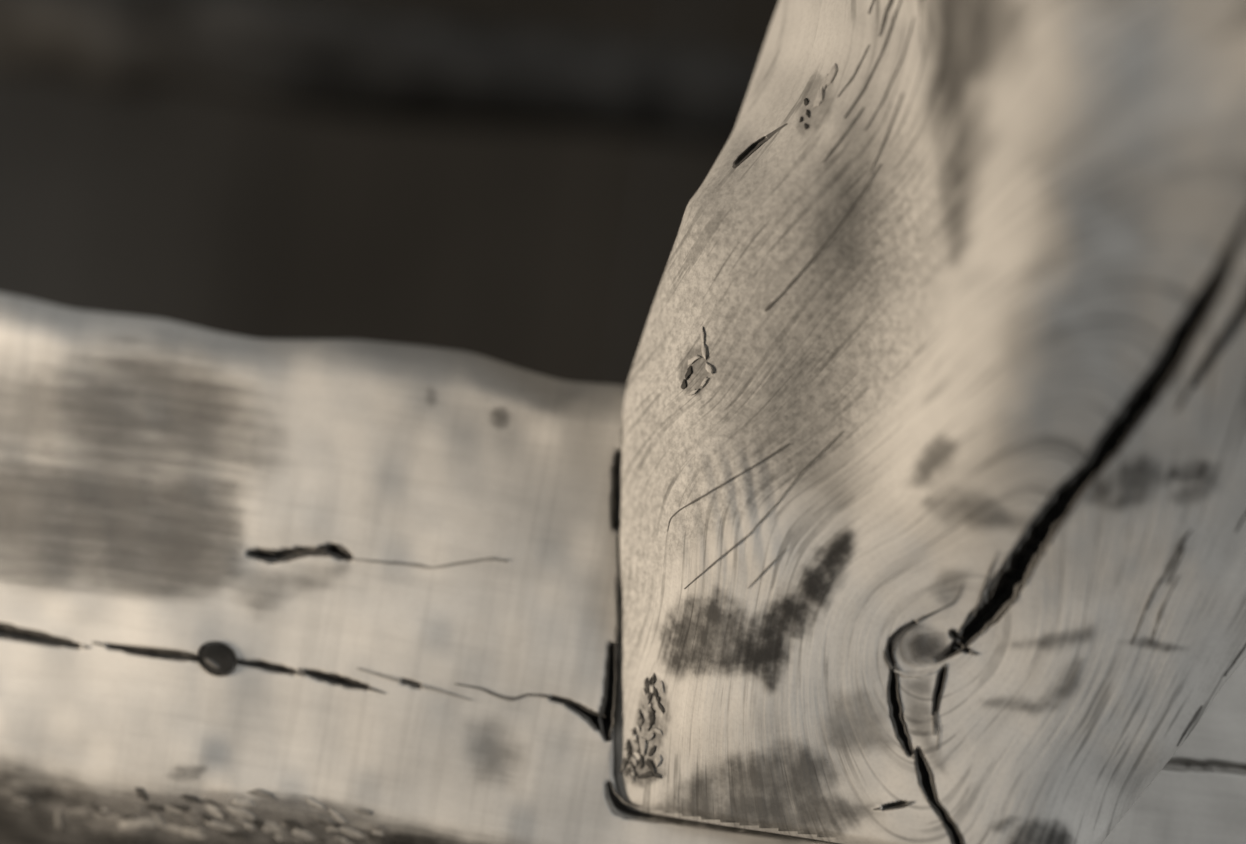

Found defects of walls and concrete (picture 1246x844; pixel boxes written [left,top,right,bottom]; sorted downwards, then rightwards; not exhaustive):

crack [246,544,508,569]
crack [873,217,1246,844]
crack [0,624,201,662]
crack [238,660,605,730]